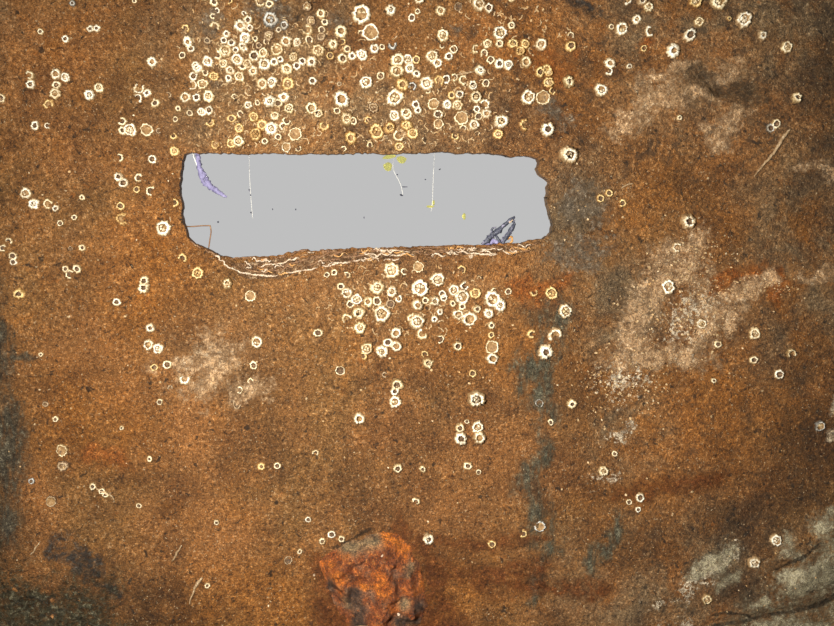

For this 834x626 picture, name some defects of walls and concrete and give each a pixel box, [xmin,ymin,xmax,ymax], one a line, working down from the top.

leakage [0,321,33,544]
rust [391,520,445,626]